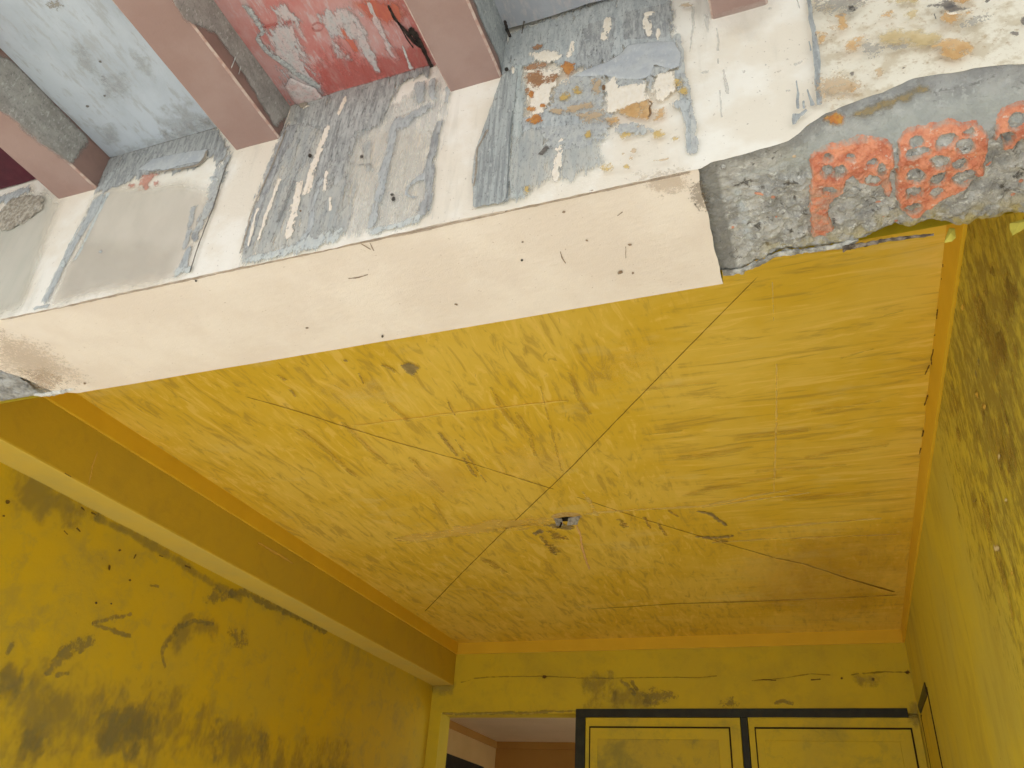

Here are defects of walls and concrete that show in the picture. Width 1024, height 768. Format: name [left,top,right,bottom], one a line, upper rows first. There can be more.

flaking render [94,128,231,194]
peeling [242,4,326,105]
peeling [317,0,414,74]
peeling [508,49,676,195]
corrosion [524,44,678,140]
spalling [698,64,1024,276]
crack [248,283,752,611]
crack [577,497,895,609]